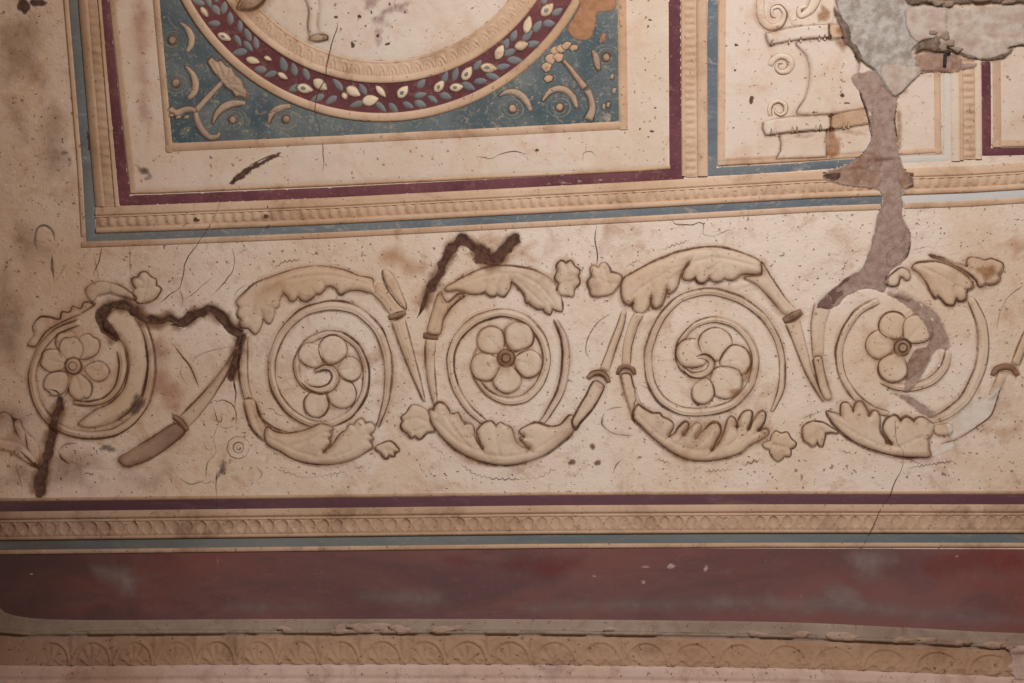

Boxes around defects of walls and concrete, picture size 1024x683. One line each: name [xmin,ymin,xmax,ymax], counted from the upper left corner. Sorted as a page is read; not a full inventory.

peeling [568,0,616,42]
spalling [915,30,964,73]
spalling [907,0,1024,8]
crack [229,152,281,184]
crack [417,233,521,318]
crack [95,228,247,400]
crack [33,385,69,497]
peeling [932,387,1003,456]
crack [864,455,920,544]